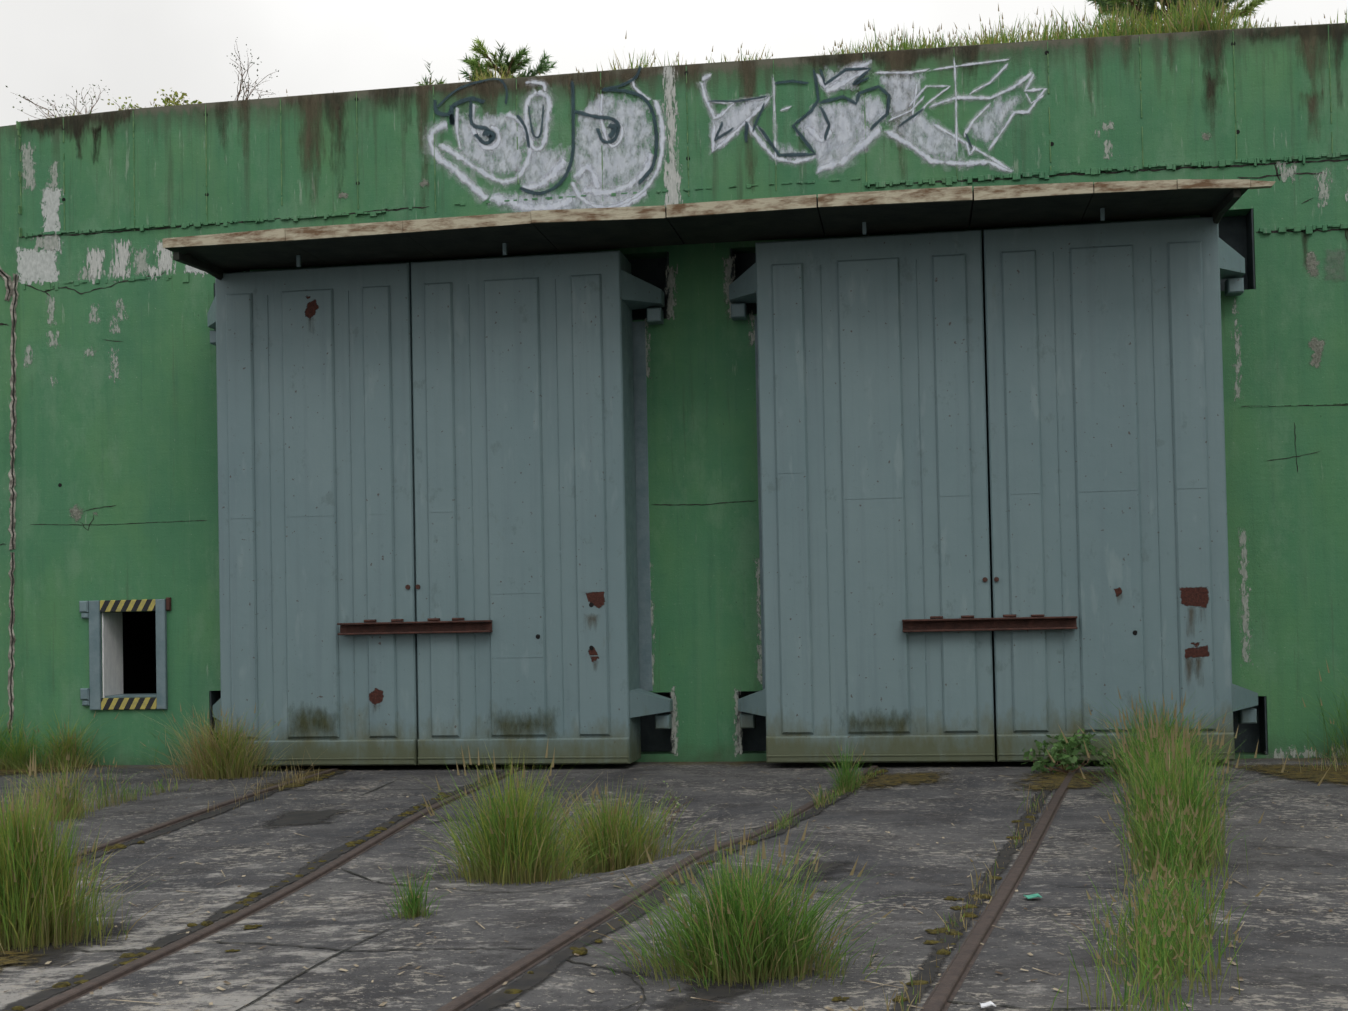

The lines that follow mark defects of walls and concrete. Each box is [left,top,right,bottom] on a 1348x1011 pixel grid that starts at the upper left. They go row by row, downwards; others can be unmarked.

damp [1245,23,1348,65]
damp [373,87,412,103]
damp [23,110,130,156]
peeling [1276,161,1296,182]
crack [349,206,429,214]
peeling [15,142,64,347]
peeling [79,237,208,284]
crack [19,218,281,238]
crack [0,267,207,733]
corrosion [586,592,605,621]
corrosion [1179,587,1209,621]
corrosion [1185,642,1210,674]